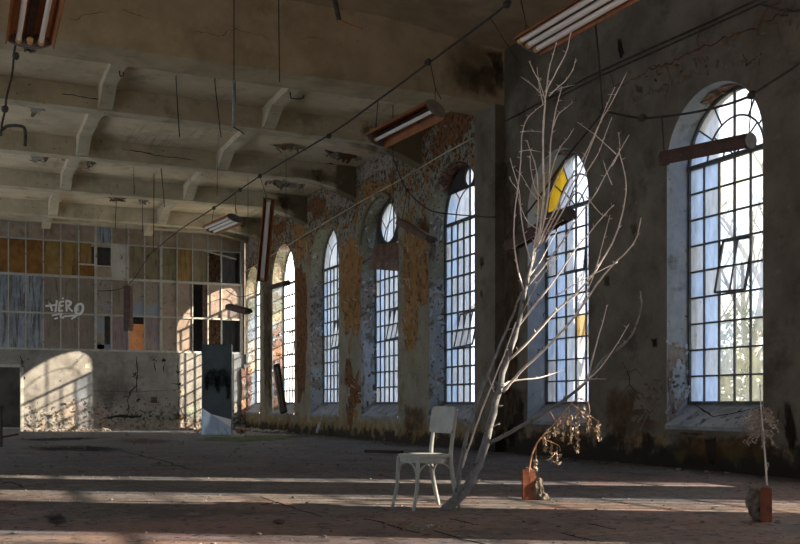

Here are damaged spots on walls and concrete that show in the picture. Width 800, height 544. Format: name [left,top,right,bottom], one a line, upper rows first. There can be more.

crack [609,0,792,99]
peeling [701,83,741,105]
peeling [271,143,307,154]
peeling [338,236,377,428]
peeling [399,213,449,406]
flaking render [24,370,202,430]
crack [105,357,186,418]
flaking render [665,340,690,420]
crack [694,404,760,418]
water stain [784,404,797,451]